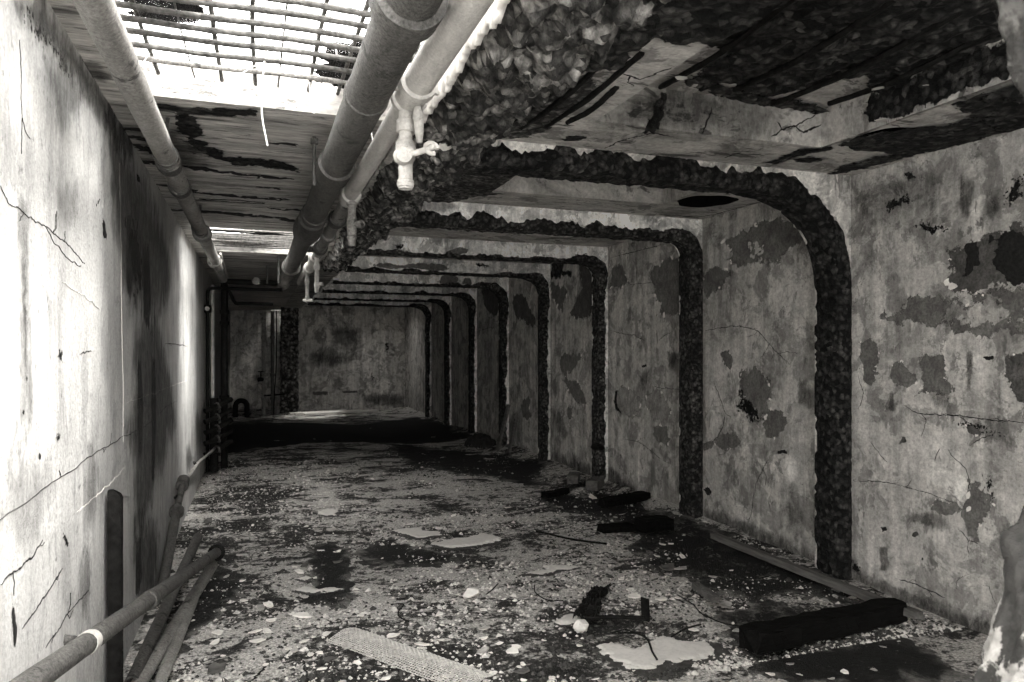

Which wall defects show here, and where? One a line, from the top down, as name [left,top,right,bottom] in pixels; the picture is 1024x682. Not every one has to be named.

damp [170,134,209,166]
crack [771,114,821,137]
crack [0,186,122,319]
damp [19,3,174,594]
spalling [307,0,1024,580]
crack [0,432,133,520]
crack [859,408,1023,502]
crack [1,540,45,596]
crack [22,568,89,648]